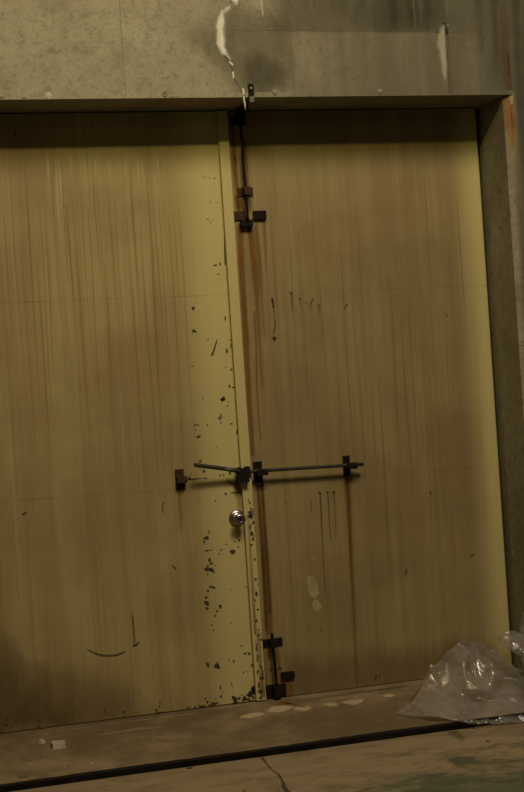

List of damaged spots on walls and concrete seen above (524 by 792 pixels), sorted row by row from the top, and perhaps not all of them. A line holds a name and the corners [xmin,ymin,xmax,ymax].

crack [261,757,290,792]